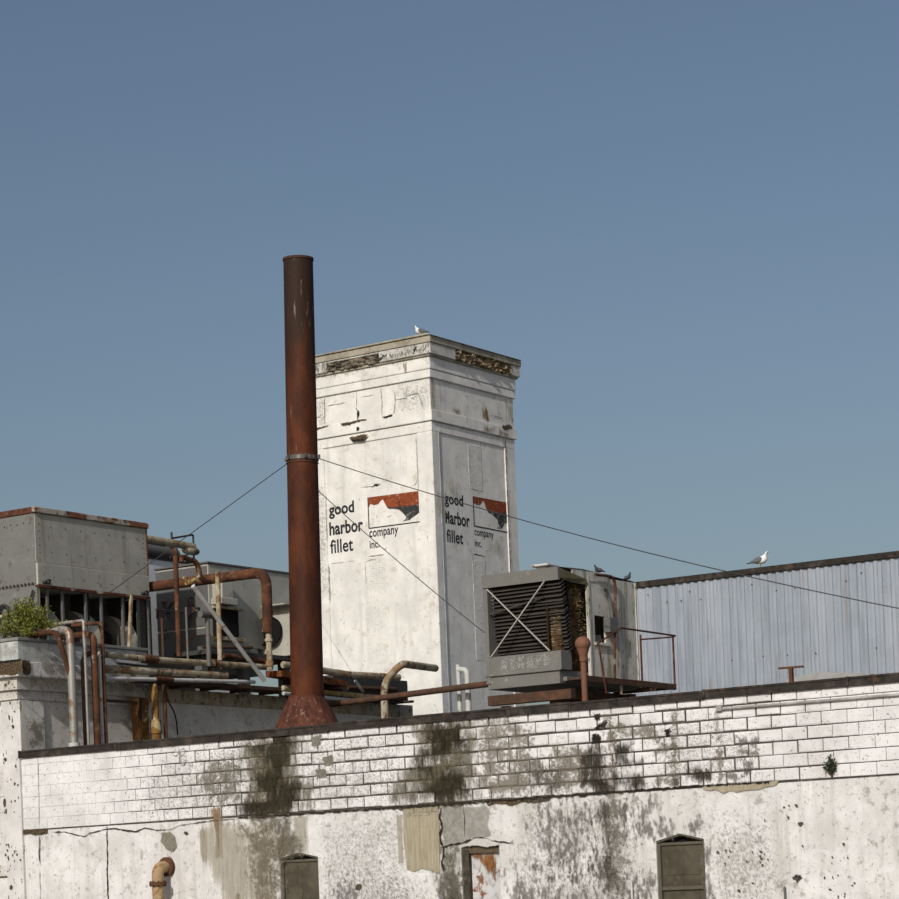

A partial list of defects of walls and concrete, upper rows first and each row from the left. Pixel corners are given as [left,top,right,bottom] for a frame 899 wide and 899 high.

spalling [326,354,379,373]
spalling [455,349,513,375]
leakage [200,736,313,899]
leakage [392,713,759,899]
leakage [328,874,367,899]